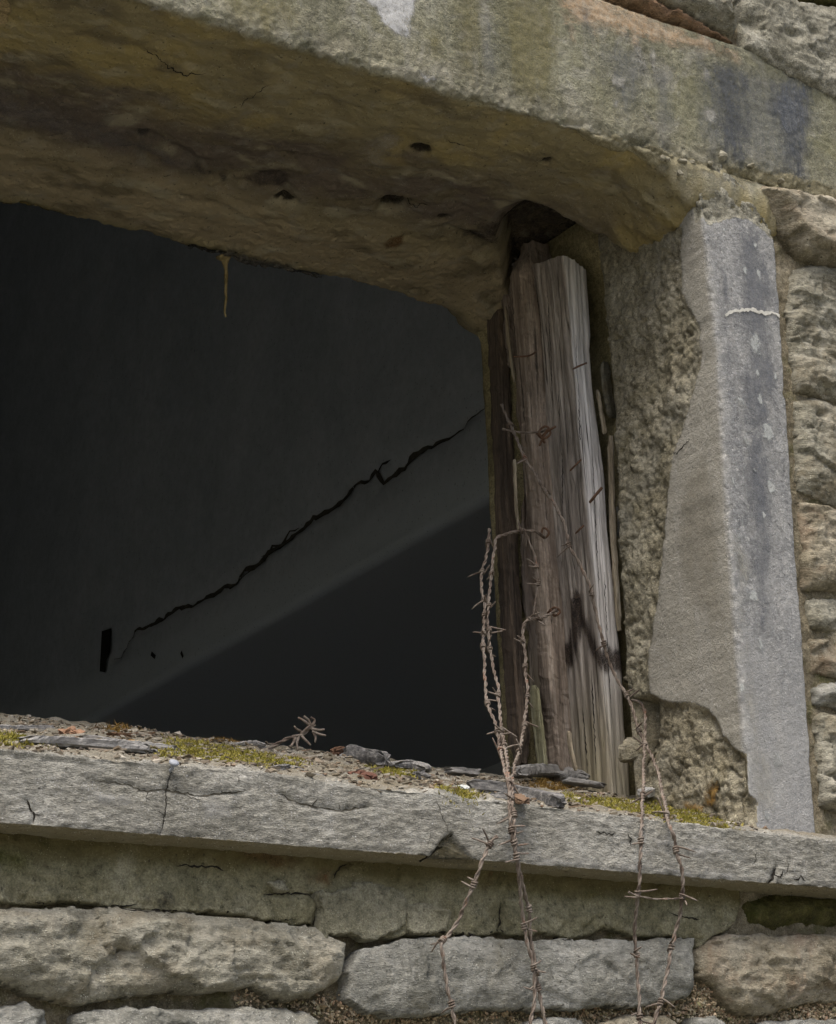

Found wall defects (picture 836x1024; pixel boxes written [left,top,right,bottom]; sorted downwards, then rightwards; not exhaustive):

crack [118,408,485,659]
spalling [598,226,758,827]
crack [92,767,247,835]
crack [407,799,453,862]